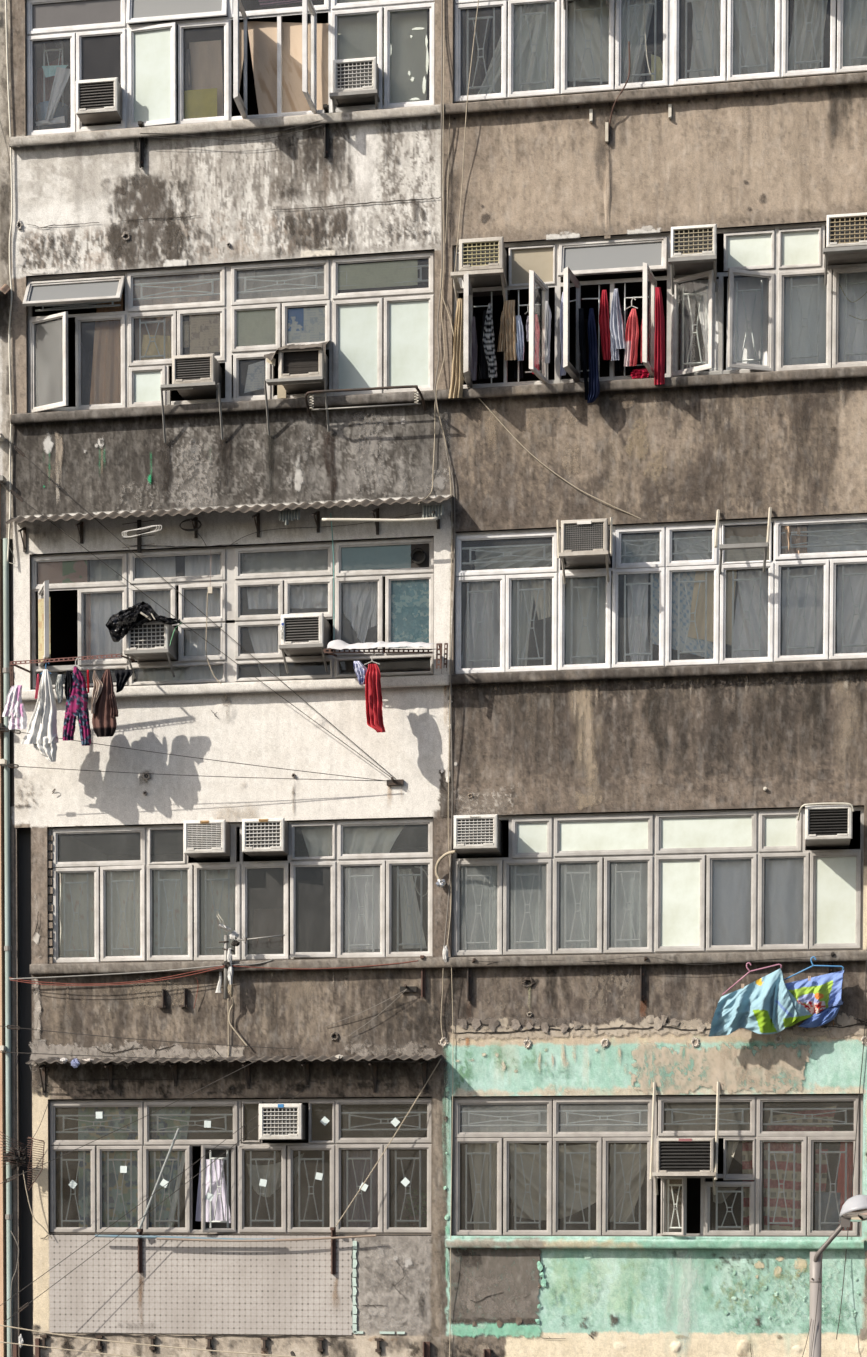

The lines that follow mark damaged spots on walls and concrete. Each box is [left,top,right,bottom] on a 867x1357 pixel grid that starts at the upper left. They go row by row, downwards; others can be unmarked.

leakage [280,123,350,182]
leakage [16,236,75,274]
leakage [103,138,208,269]
leakage [275,209,353,257]
leakage [380,200,430,239]
leakage [43,433,63,497]
leakage [159,434,231,508]
leakage [287,457,303,491]
leakage [573,683,601,809]
peeling [29,979,244,1096]
peeling [330,1012,867,1129]
peeling [724,1251,867,1339]